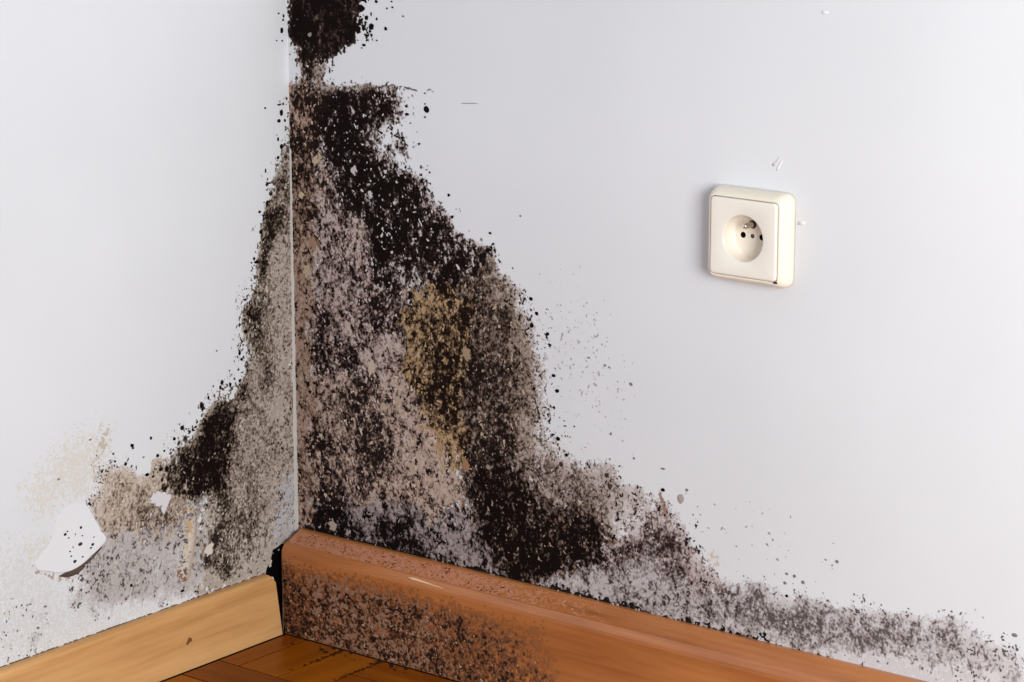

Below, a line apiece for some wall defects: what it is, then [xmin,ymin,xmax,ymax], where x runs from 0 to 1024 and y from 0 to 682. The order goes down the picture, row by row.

peeling [34,504,107,573]
mould [282,553,559,682]